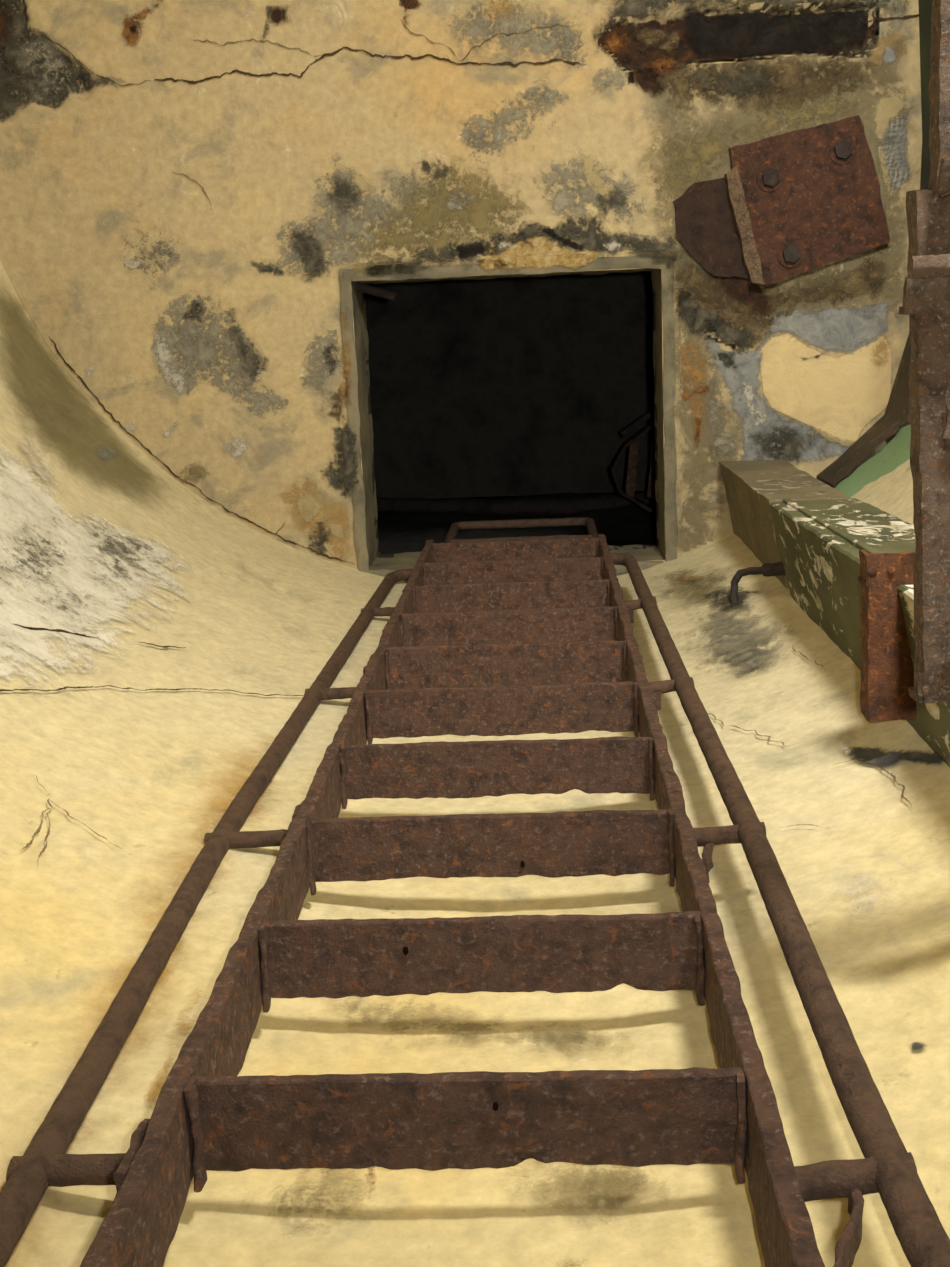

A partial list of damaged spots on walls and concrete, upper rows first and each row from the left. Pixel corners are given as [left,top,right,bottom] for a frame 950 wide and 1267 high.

corrosion [122,4,158,46]
crack [23,0,584,86]
corrosion [635,56,869,110]
damp [252,0,912,553]
peeling [706,301,892,462]
damp [0,299,192,692]
damp [665,570,779,674]
crack [0,685,304,696]
crack [708,713,785,746]
crack [20,780,131,867]
crack [835,758,911,804]